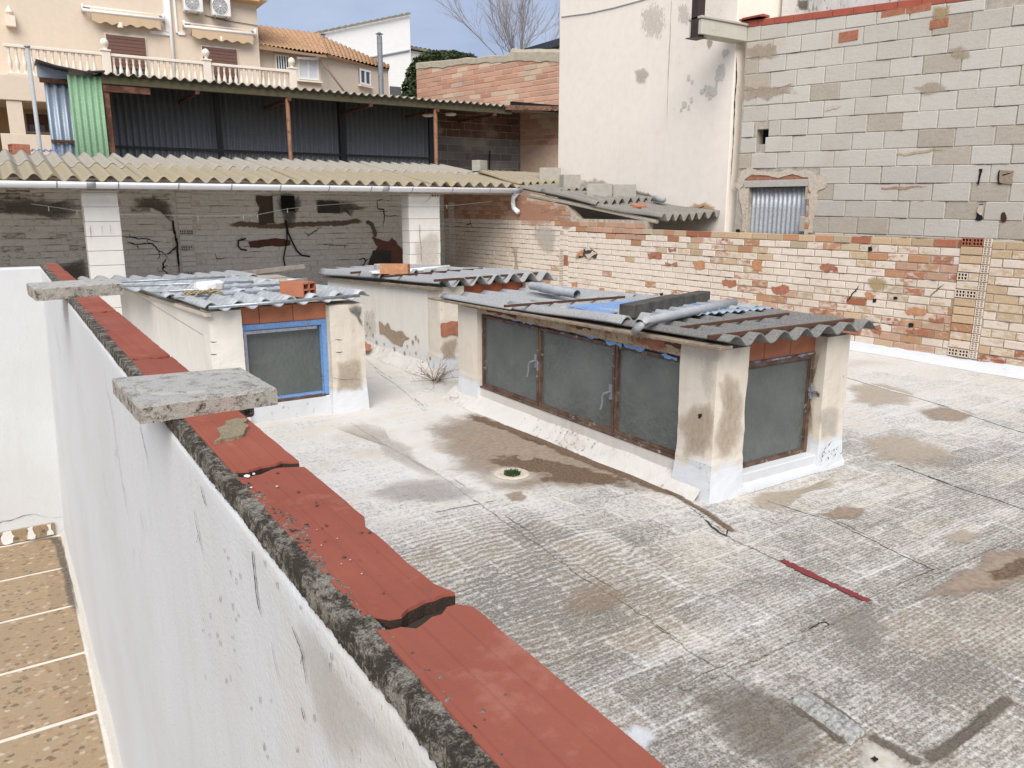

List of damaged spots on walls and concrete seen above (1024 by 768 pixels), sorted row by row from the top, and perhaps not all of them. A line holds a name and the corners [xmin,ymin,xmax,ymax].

crack [90,220,180,274]
spalling [368,237,403,265]
flaking render [365,321,431,363]
water stain [339,361,361,389]
water stain [680,380,742,452]
water stain [438,415,735,531]
water stain [926,551,1024,596]